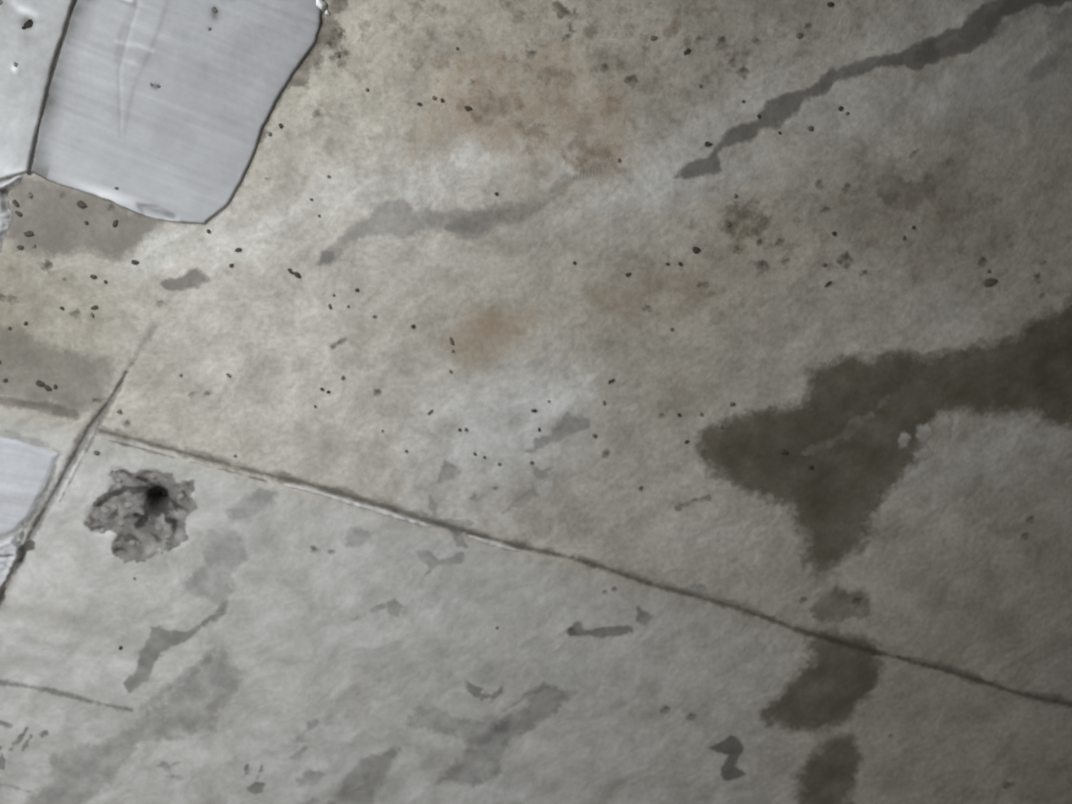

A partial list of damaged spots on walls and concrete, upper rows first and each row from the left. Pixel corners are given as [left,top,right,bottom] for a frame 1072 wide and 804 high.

peeling [316,0,330,15]
leakage [877,0,1012,69]
leakage [813,76,834,94]
leakage [725,124,753,141]
peeling [0,174,22,252]
crack [19,371,127,561]
leakage [701,305,1072,559]
peeling [0,536,23,596]
spalling [84,470,194,562]
crack [284,484,431,528]
crack [468,535,520,552]
leakage [764,640,877,729]